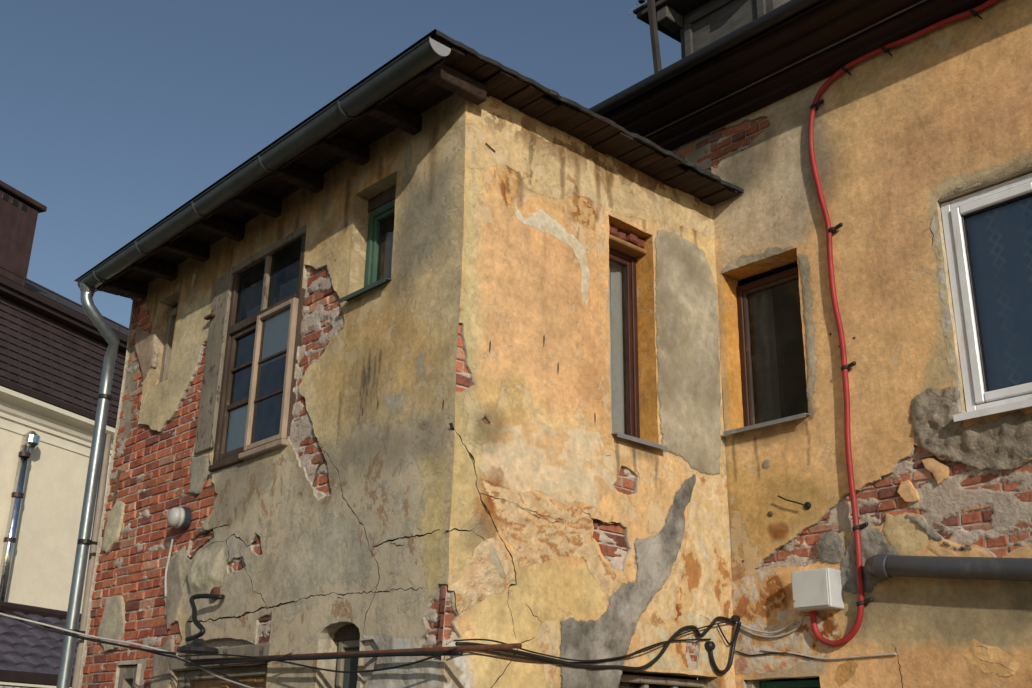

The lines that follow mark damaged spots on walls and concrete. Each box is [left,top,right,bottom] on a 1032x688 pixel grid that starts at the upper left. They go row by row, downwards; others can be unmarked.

peeling [468,96,715,306]
spalling [674,116,771,172]
spalling [287,265,345,500]
spalling [442,323,475,409]
spalling [78,296,218,688]
spalling [205,607,272,648]
spalling [226,532,263,574]
crack [187,423,620,688]
peeling [357,583,470,688]
peeling [480,413,638,591]
spalling [647,340,1032,677]
peeling [834,659,858,687]